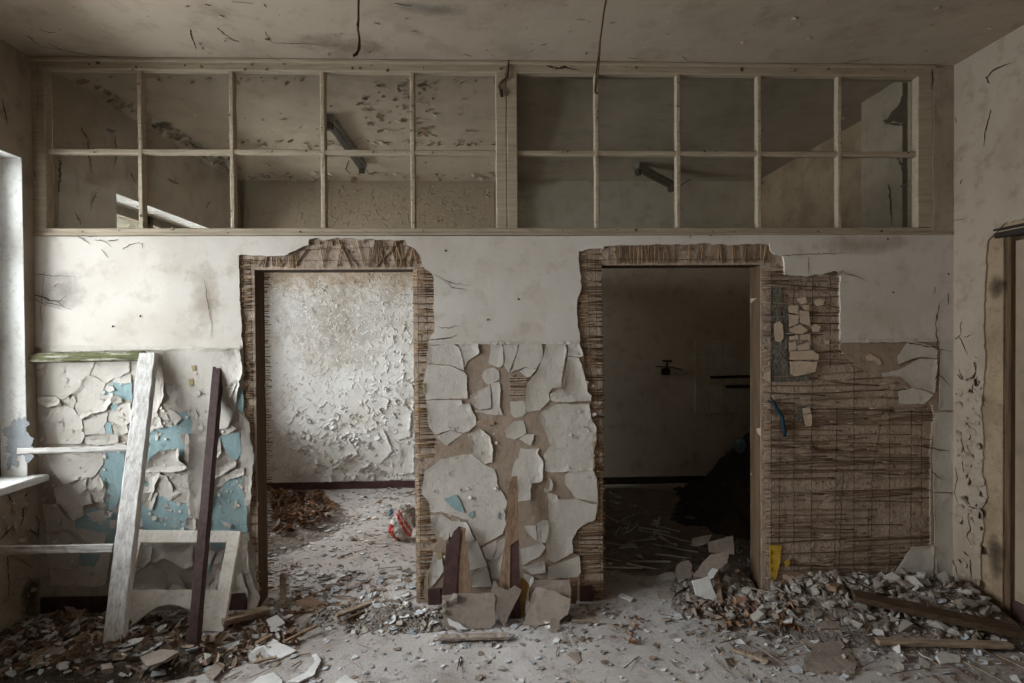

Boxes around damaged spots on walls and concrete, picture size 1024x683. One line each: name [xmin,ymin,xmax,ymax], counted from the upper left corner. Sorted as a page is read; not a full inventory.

peeling [2,350,133,587]
peeling [76,63,986,610]